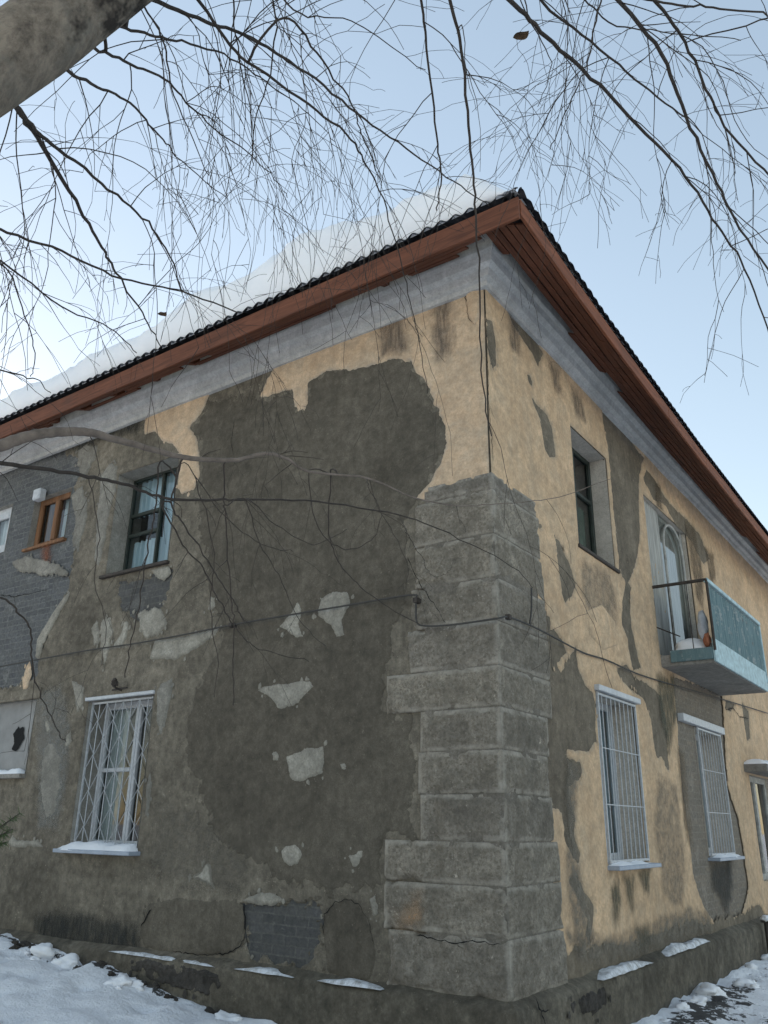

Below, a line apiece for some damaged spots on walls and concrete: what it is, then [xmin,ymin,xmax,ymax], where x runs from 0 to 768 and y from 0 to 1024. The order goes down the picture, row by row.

flaking render [508,314,557,461]
peeling [144,395,209,497]
flaking render [0,444,118,689]
flaking render [91,565,222,672]
peeling [277,592,354,637]
flaking render [554,531,576,603]
peeling [258,676,313,709]
peeling [272,740,327,785]
flaking render [546,616,599,863]
flaking render [566,412,765,980]
crack [175,904,249,956]
crack [417,934,498,948]